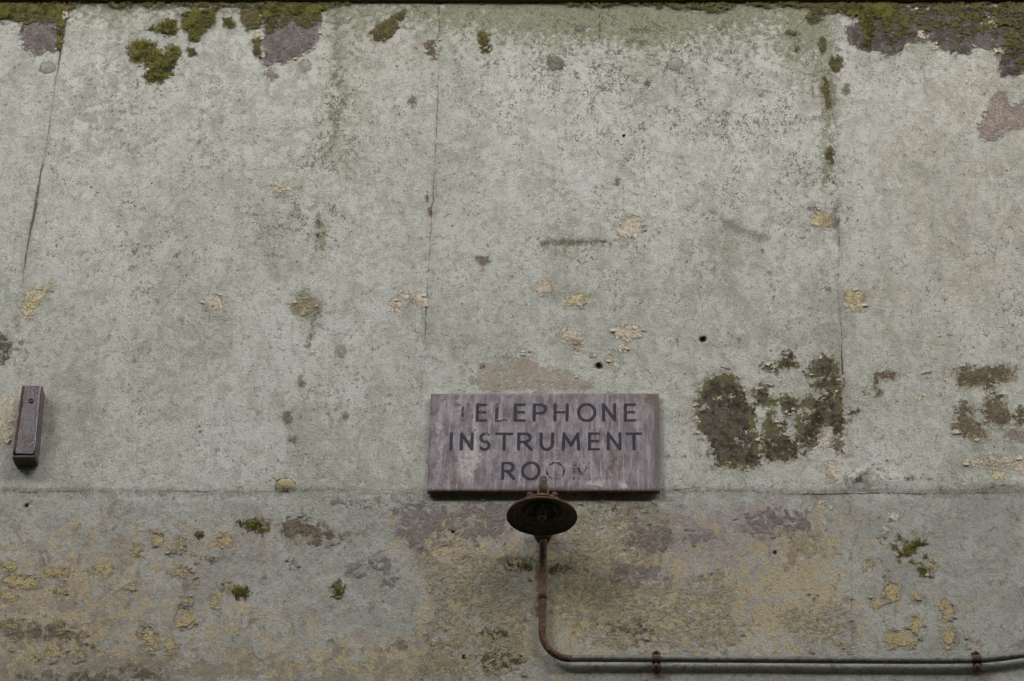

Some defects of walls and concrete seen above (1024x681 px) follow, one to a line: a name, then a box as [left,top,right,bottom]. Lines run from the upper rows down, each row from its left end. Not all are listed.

crack [23,19,67,270]
peeling [615,212,647,240]
peeling [557,322,646,367]
peeling [0,531,236,681]
peeling [866,507,973,651]